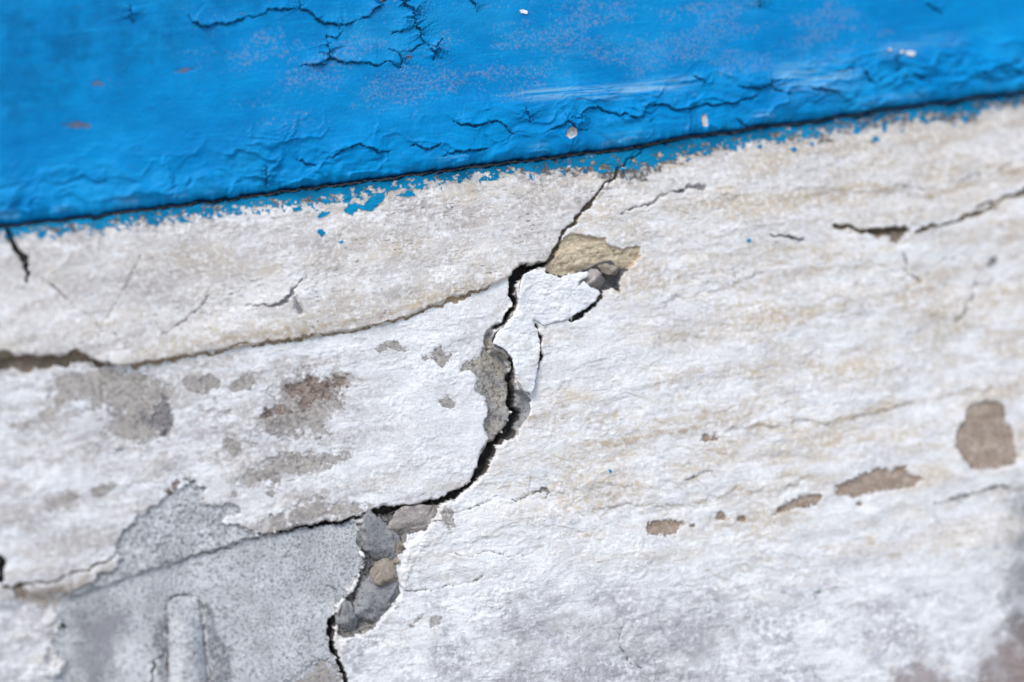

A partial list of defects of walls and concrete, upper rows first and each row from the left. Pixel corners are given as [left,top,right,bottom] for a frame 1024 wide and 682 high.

crack [188,0,444,68]
crack [296,55,1024,166]
spalling [545,233,641,293]
crack [832,188,1024,282]
crack [0,147,637,569]
peeling [955,401,1017,471]
peeling [45,365,456,682]
peeling [647,519,695,537]
peeling [777,494,822,513]
peeling [835,465,924,506]
crack [405,551,524,592]
crack [324,585,348,682]